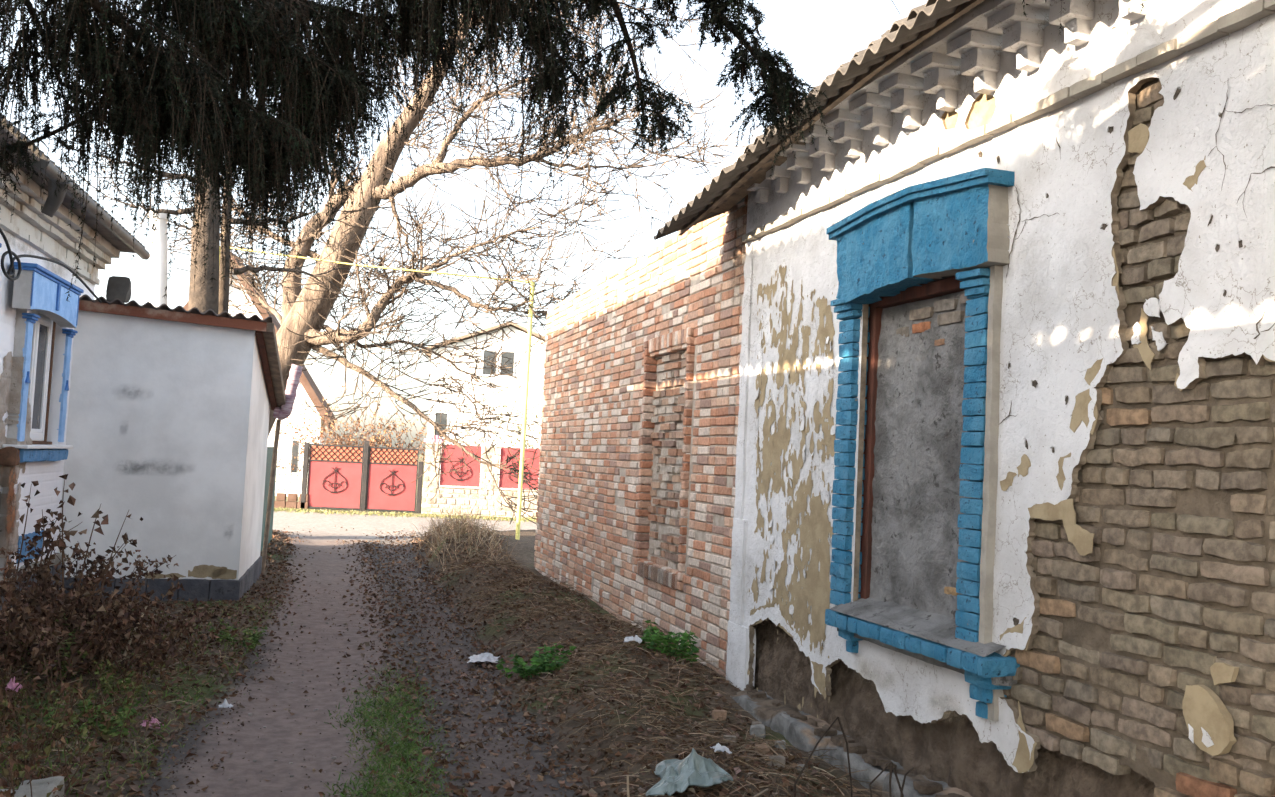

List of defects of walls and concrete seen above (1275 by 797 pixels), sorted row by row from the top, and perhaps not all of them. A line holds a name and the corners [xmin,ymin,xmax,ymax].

crack [1208,90,1275,220]
peeling [0,352,32,558]
spalling [744,78,1275,797]